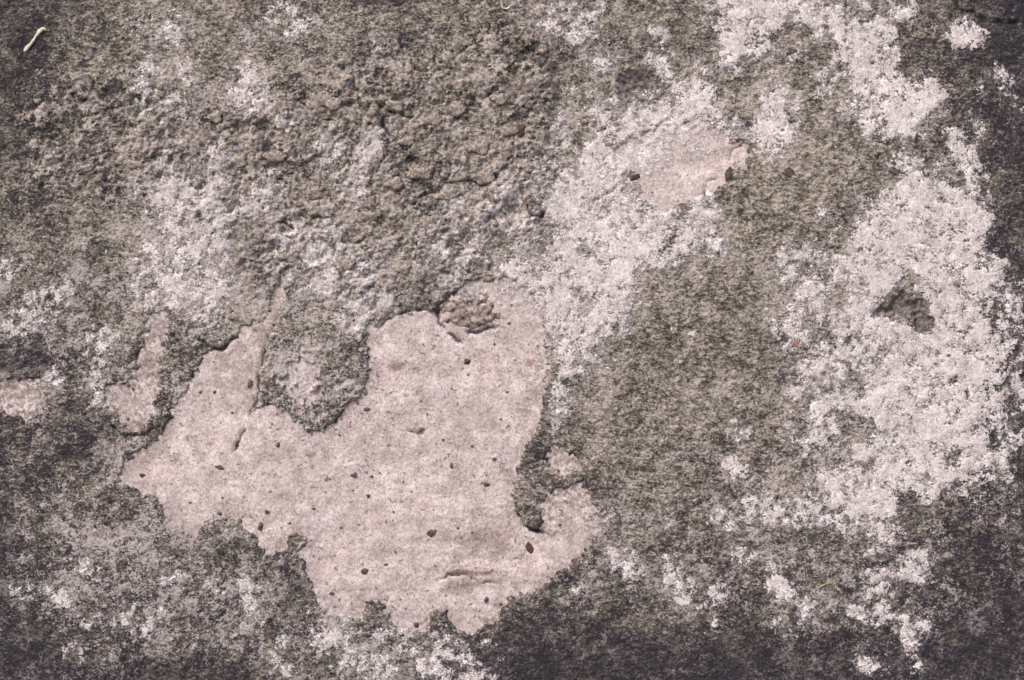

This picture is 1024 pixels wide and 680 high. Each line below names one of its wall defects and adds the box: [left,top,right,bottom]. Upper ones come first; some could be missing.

damp [272,340,336,412]
spalling [13,2,600,635]
damp [405,0,1024,677]